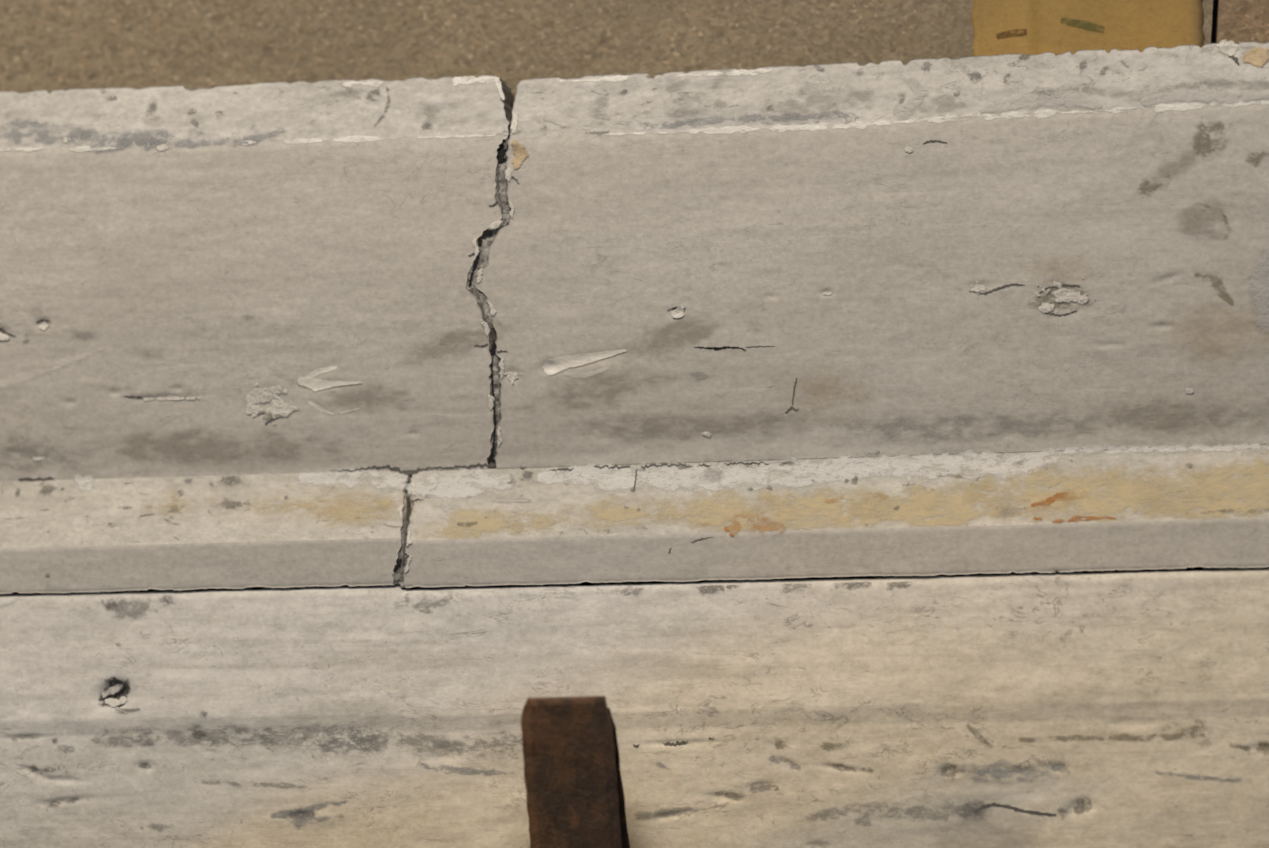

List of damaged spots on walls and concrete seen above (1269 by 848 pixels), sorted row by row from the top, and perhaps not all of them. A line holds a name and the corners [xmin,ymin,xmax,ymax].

spalling [969,277,1095,316]
crack [331,113,791,588]
spalling [244,382,299,425]
peeling [101,684,127,707]